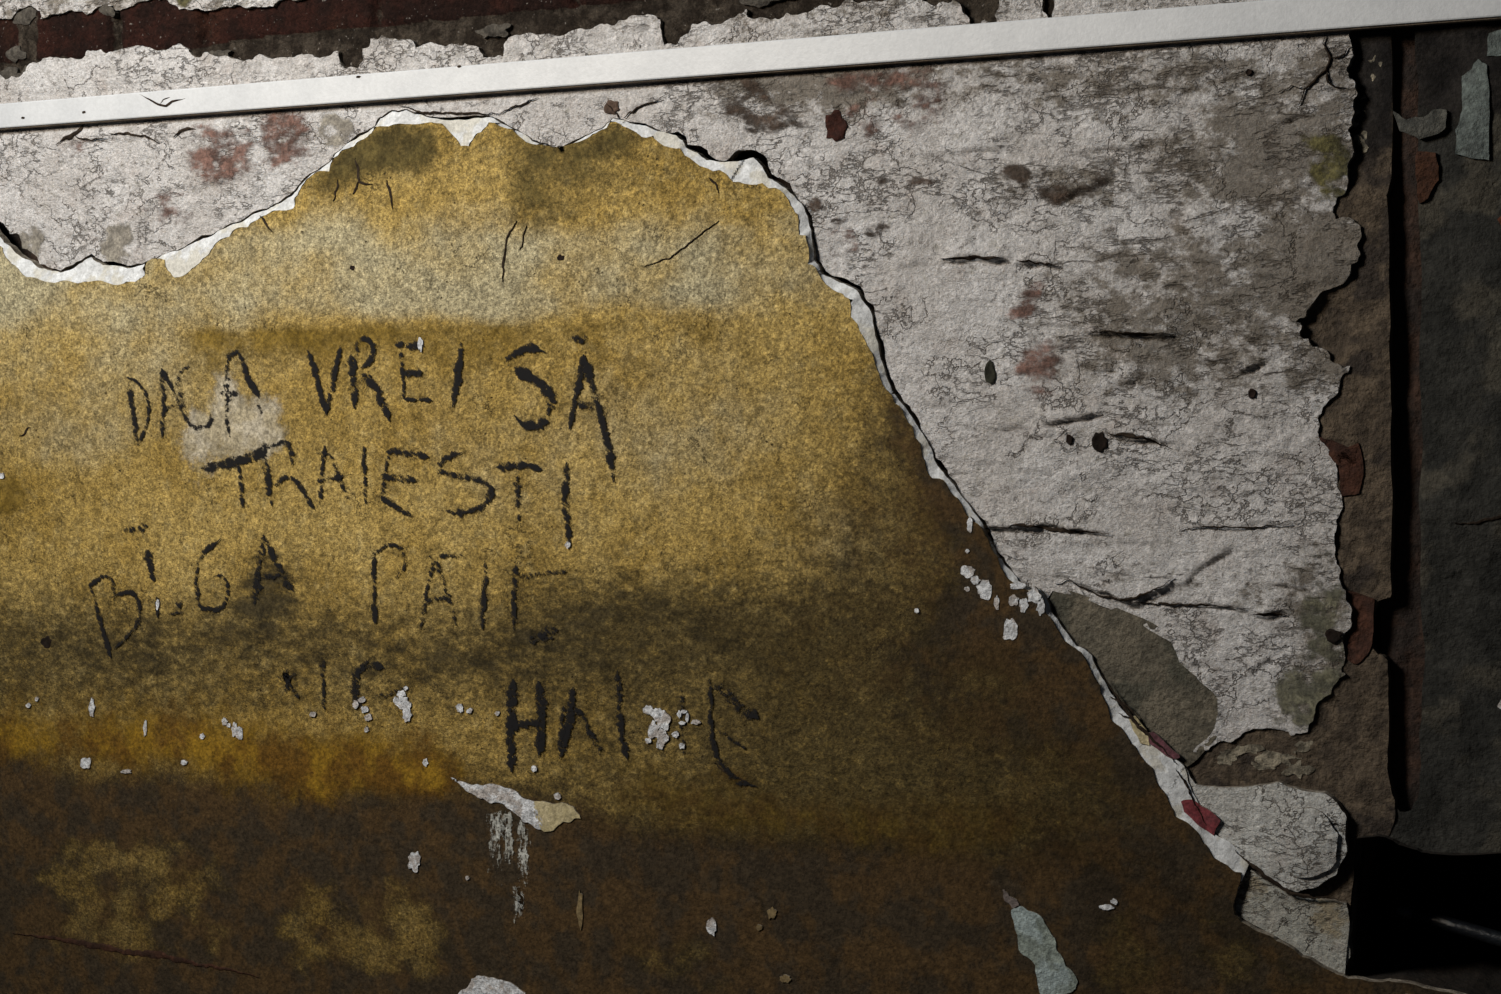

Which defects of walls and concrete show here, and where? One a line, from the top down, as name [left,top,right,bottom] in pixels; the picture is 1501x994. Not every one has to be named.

flaking render [0,0,1258,104]
leakage [318,113,434,186]
leakage [514,128,628,220]
leakage [20,226,44,257]
leakage [100,224,132,263]
leakage [193,325,407,366]
flaking render [0,31,1362,768]
flaking render [1188,28,1448,973]
leakage [0,392,1454,994]
flaking render [1038,588,1353,973]
peeling [451,777,581,921]
peeling [1003,890,1078,994]